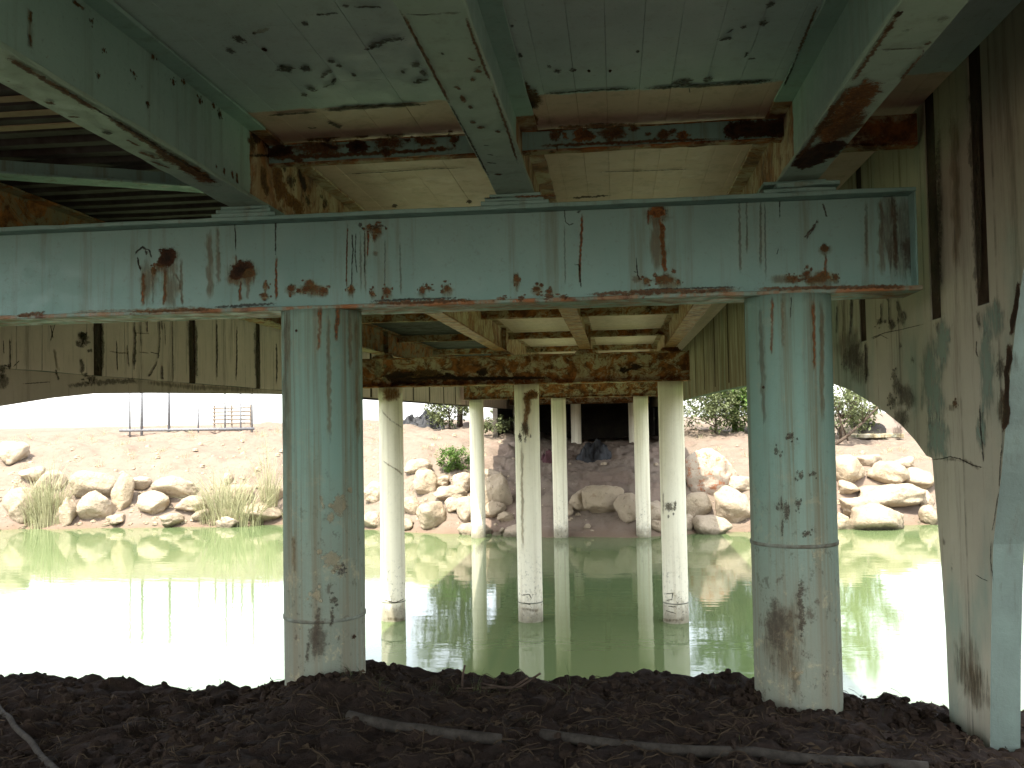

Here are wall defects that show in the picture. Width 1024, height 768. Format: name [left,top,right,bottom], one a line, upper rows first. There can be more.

corrosion [247,12,517,214]
corrosion [543,123,711,151]
corrosion [791,11,903,170]
water stain [968,94,982,292]
corrosion [133,246,276,313]
corrosion [287,279,331,298]
corrosion [587,207,734,297]
corrosion [760,244,912,353]
water stain [70,324,135,387]
water stain [188,323,198,376]
crack [931,406,1002,581]
water stain [767,580,806,648]